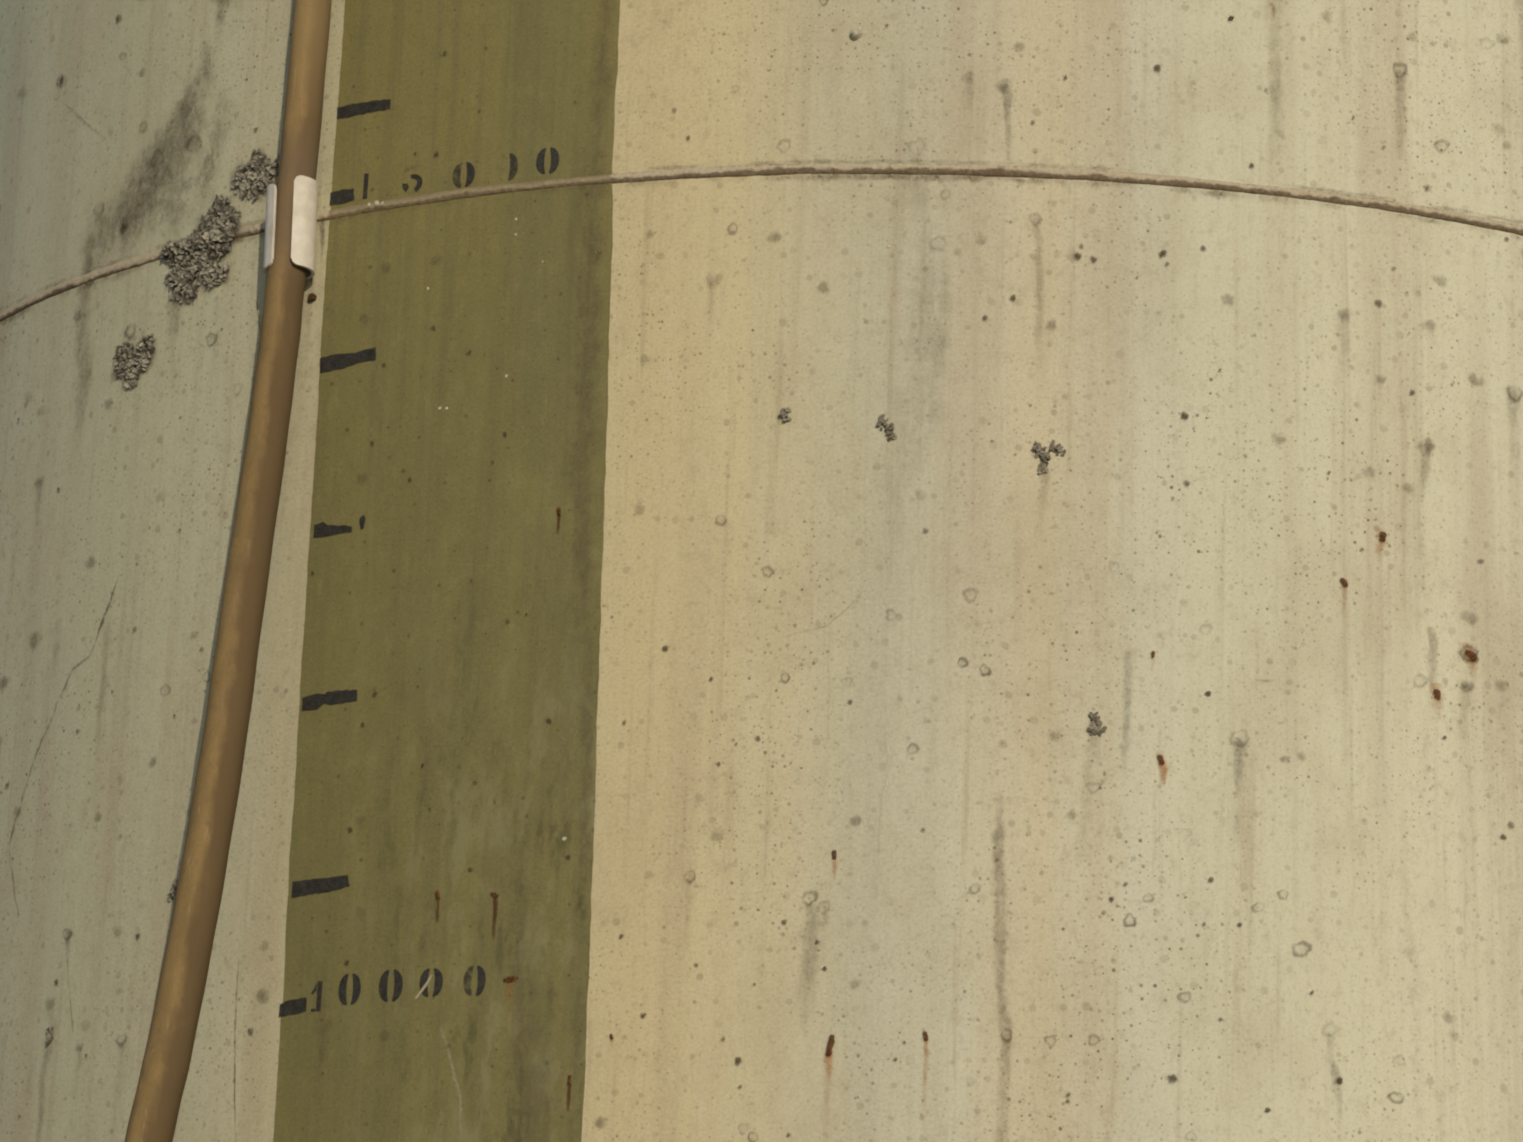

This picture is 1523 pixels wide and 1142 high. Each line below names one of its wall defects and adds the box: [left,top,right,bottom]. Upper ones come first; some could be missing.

crack [64,587,115,688]
rust [491,892,499,935]
rust [825,1034,835,1074]